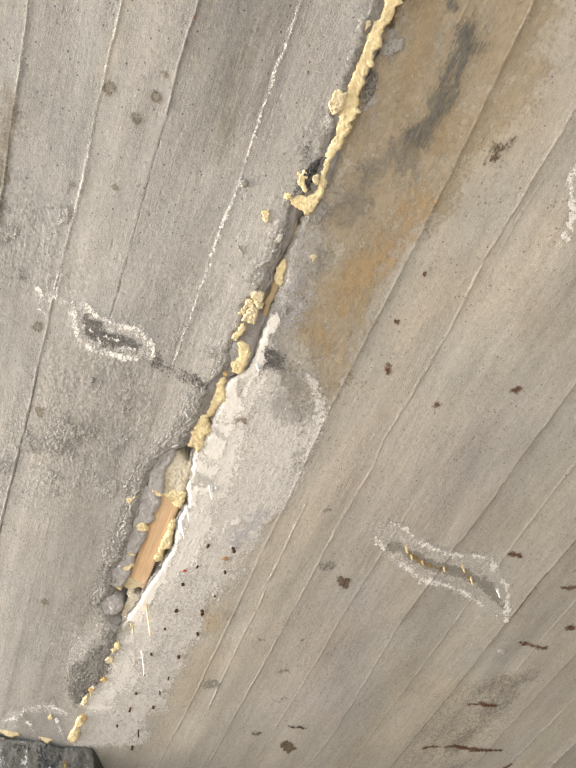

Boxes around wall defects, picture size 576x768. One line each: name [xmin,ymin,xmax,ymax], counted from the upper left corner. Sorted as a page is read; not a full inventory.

crack [349,0,385,98]
water stain [32,1,300,390]
water stain [561,164,576,243]
crack [177,113,345,455]
spalling [88,343,231,607]
crack [103,541,142,652]
water stain [372,521,514,623]
water stain [65,626,109,696]
corrosion [423,745,502,753]